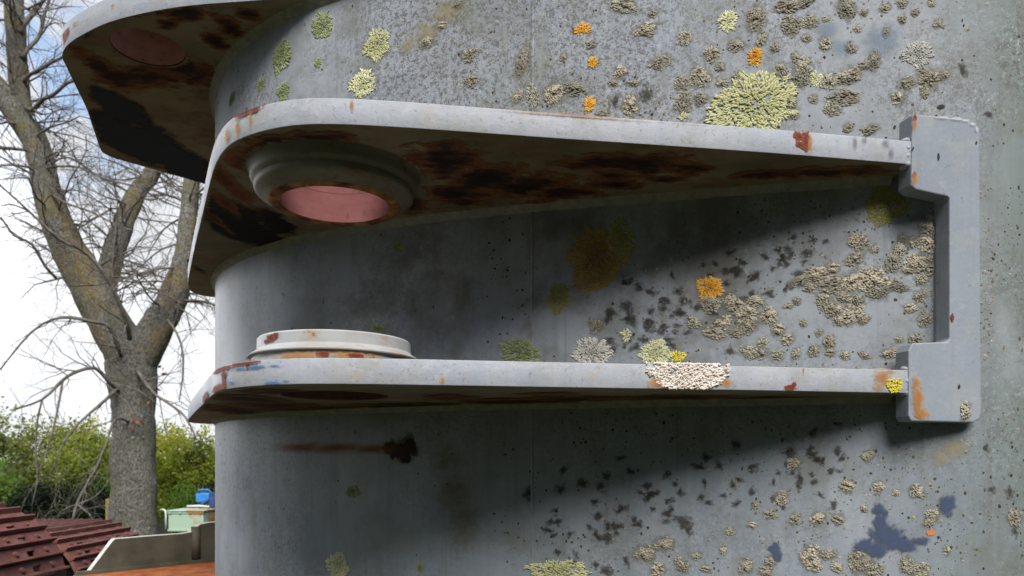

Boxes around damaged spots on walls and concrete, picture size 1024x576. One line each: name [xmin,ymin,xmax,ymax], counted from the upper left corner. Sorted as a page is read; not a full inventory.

rust [134,8,261,50]
rust [62,23,215,96]
rust [793,131,812,152]
rust [204,105,357,234]
rust [400,139,717,215]
rust [728,165,891,180]
rust [200,358,797,415]
rust [874,370,894,390]
rust [913,378,928,419]
rust [285,434,417,464]